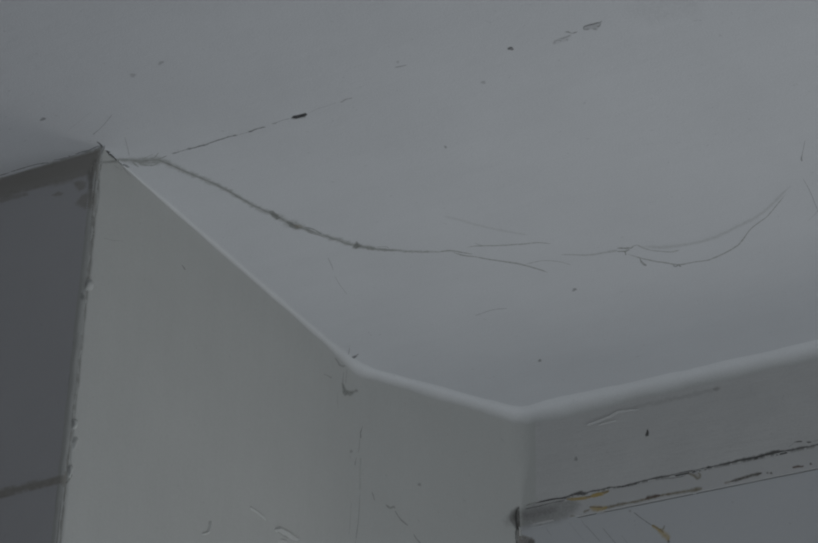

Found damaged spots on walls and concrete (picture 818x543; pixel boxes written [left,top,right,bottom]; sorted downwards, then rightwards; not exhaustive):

crack [97,118,818,273]
crack [519,440,818,510]